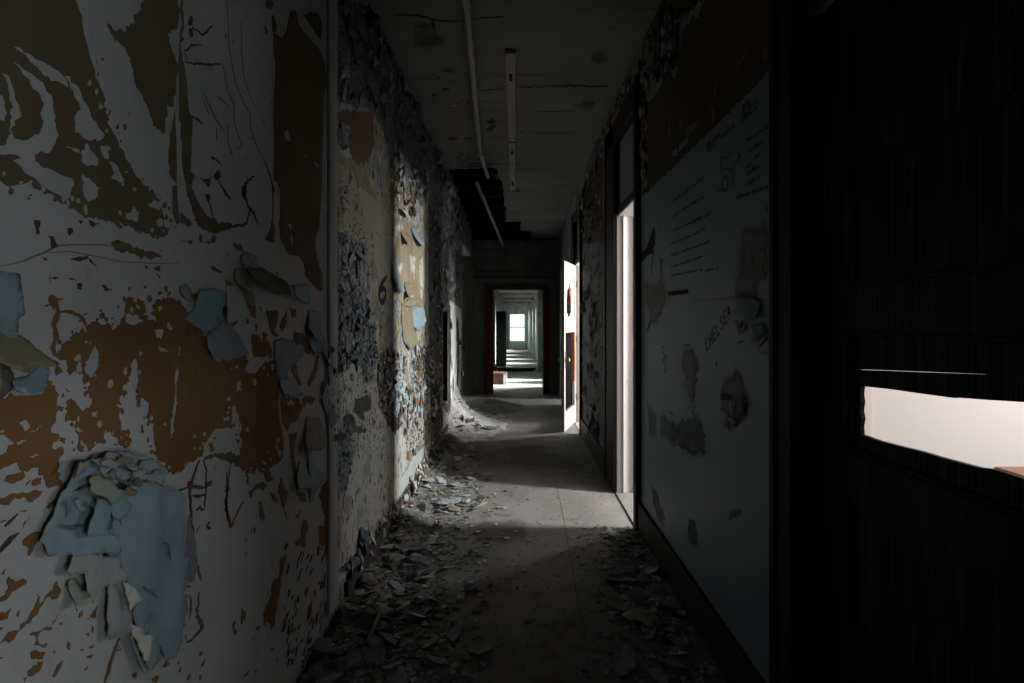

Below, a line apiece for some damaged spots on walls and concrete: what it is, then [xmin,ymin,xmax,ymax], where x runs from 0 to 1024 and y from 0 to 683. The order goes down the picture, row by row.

peeling [0,0,497,683]
peeling [579,250,603,442]
flaking render [720,374,747,430]